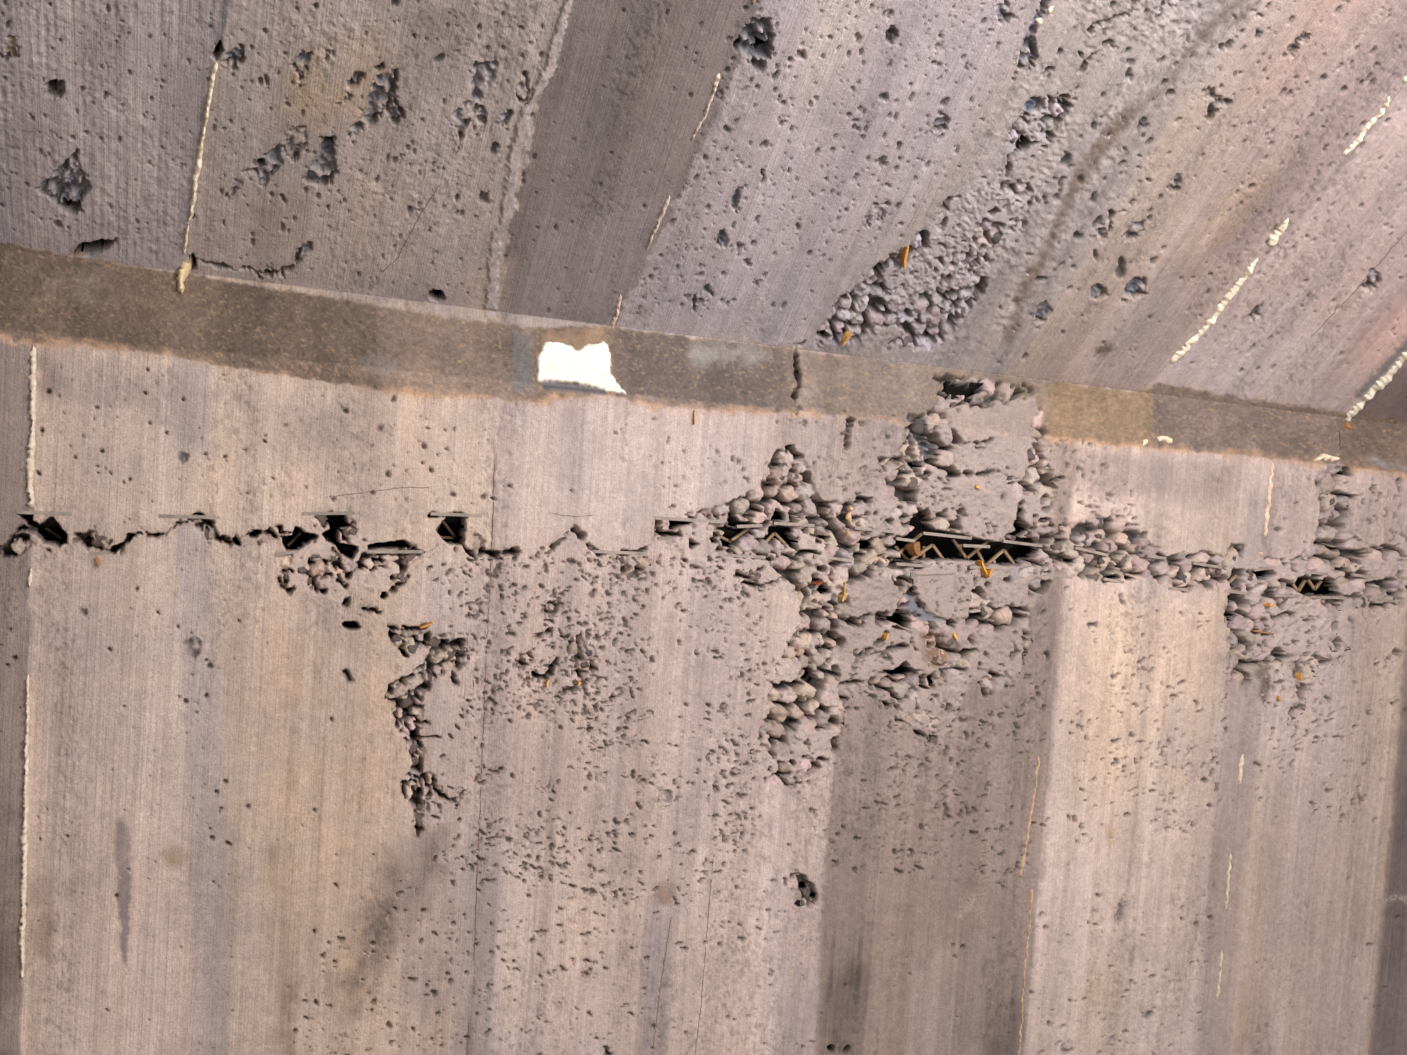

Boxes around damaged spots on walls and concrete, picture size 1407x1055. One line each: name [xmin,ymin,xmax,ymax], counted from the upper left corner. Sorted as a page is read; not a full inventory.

spalling [862,199,892,230]
crack [1312,232,1407,336]
spalling [932,370,1038,410]
peeling [1346,352,1407,422]
spalling [377,423,393,437]
spalling [905,422,940,465]
peeling [1143,436,1173,446]
crack [0,508,289,558]
crack [324,463,665,961]
hole [423,554,794,910]
spalling [794,585,1231,890]
spalling [1253,608,1405,823]